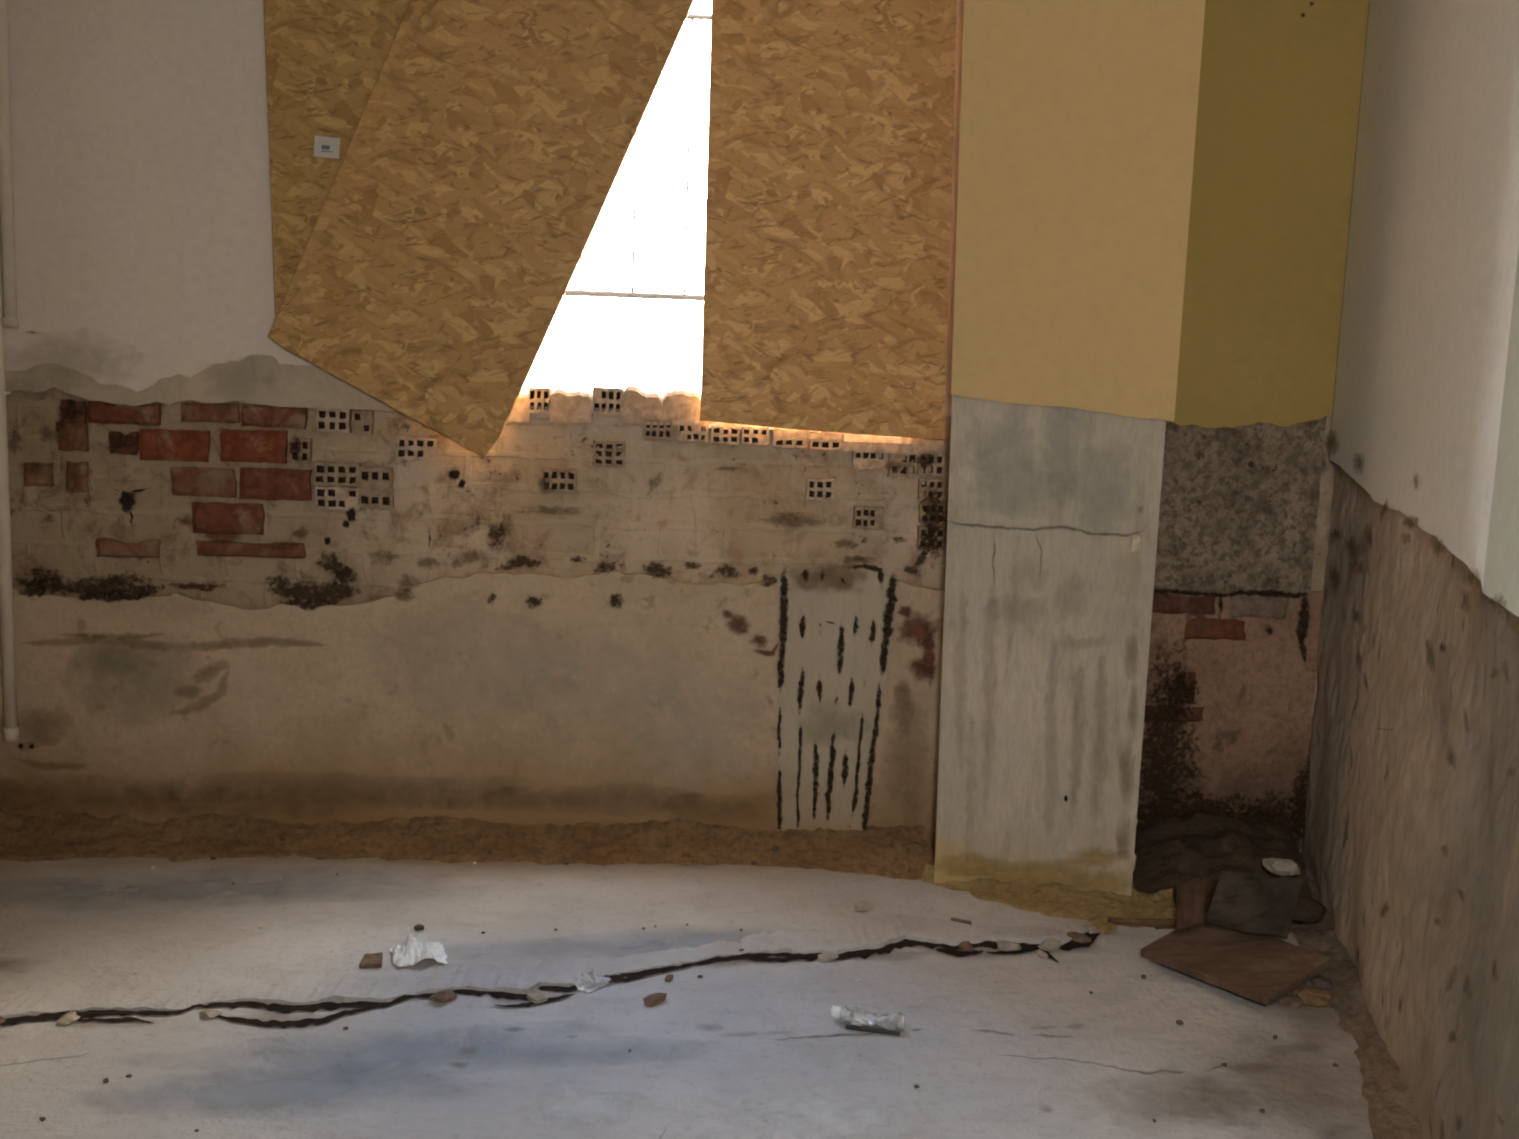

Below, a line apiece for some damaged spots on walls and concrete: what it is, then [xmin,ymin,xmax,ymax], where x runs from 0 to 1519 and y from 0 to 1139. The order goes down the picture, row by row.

peeling [0,0,438,559]
peeling [945,0,1519,851]
spalling [449,470,465,488]
flaking render [540,419,946,551]
water stain [19,566,225,603]
water stain [265,552,361,610]
water stain [488,524,541,570]
water stain [610,594,623,607]
water stain [643,561,777,587]
flaking render [837,505,885,561]
spalling [359,952,383,969]
crack [0,914,1100,1028]